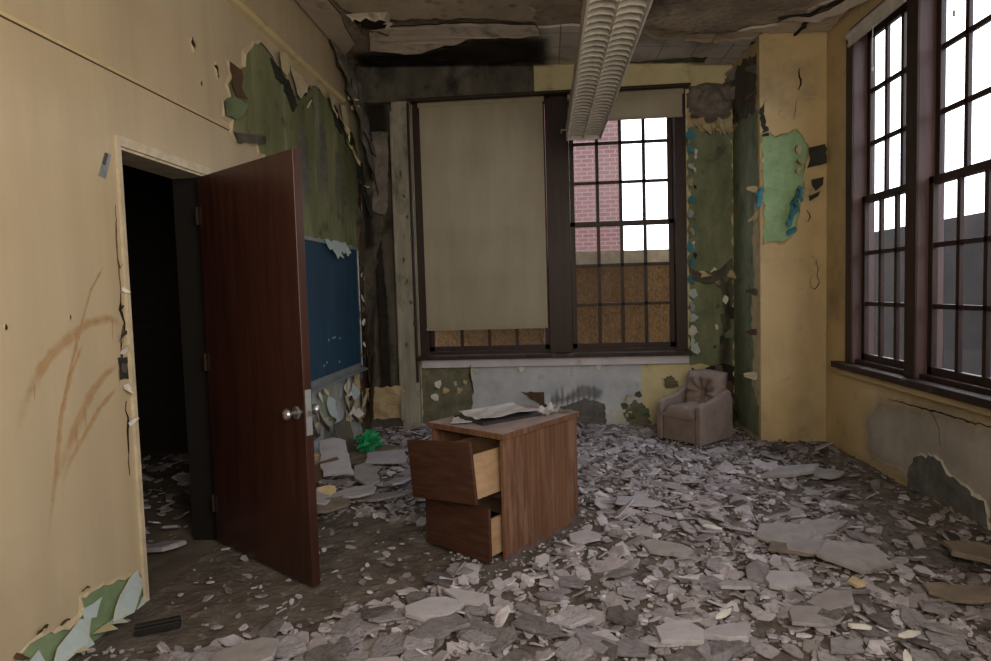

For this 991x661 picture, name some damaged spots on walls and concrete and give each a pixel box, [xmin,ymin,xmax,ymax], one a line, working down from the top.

peeling [213,39,379,465]
peeling [629,0,854,437]
corrosion [39,316,113,472]
peeling [421,364,652,426]
spalling [868,403,991,530]
peeling [13,570,146,661]